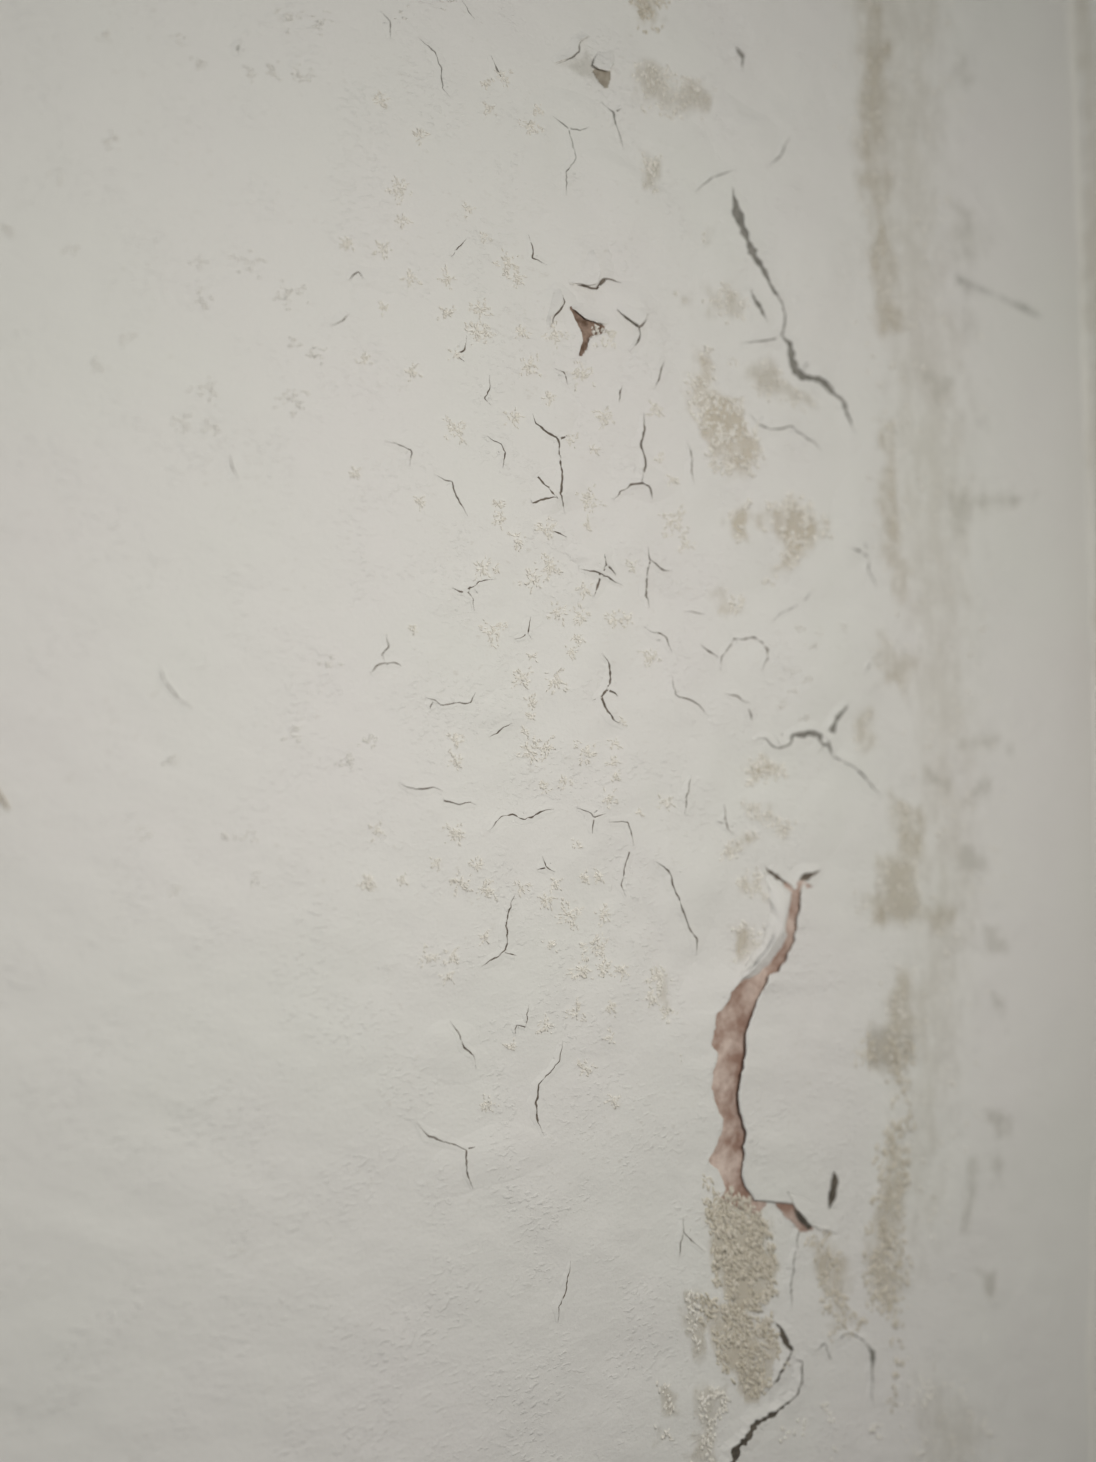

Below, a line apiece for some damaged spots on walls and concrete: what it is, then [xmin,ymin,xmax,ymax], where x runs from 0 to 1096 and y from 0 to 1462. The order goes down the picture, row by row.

peeling [551,31,615,88]
peeling [546,250,648,359]
crack [693,134,863,455]
peeling [652,863,876,1234]
leakage [685,1174,791,1462]
crack [717,1226,880,1462]
leakage [804,988,929,1439]